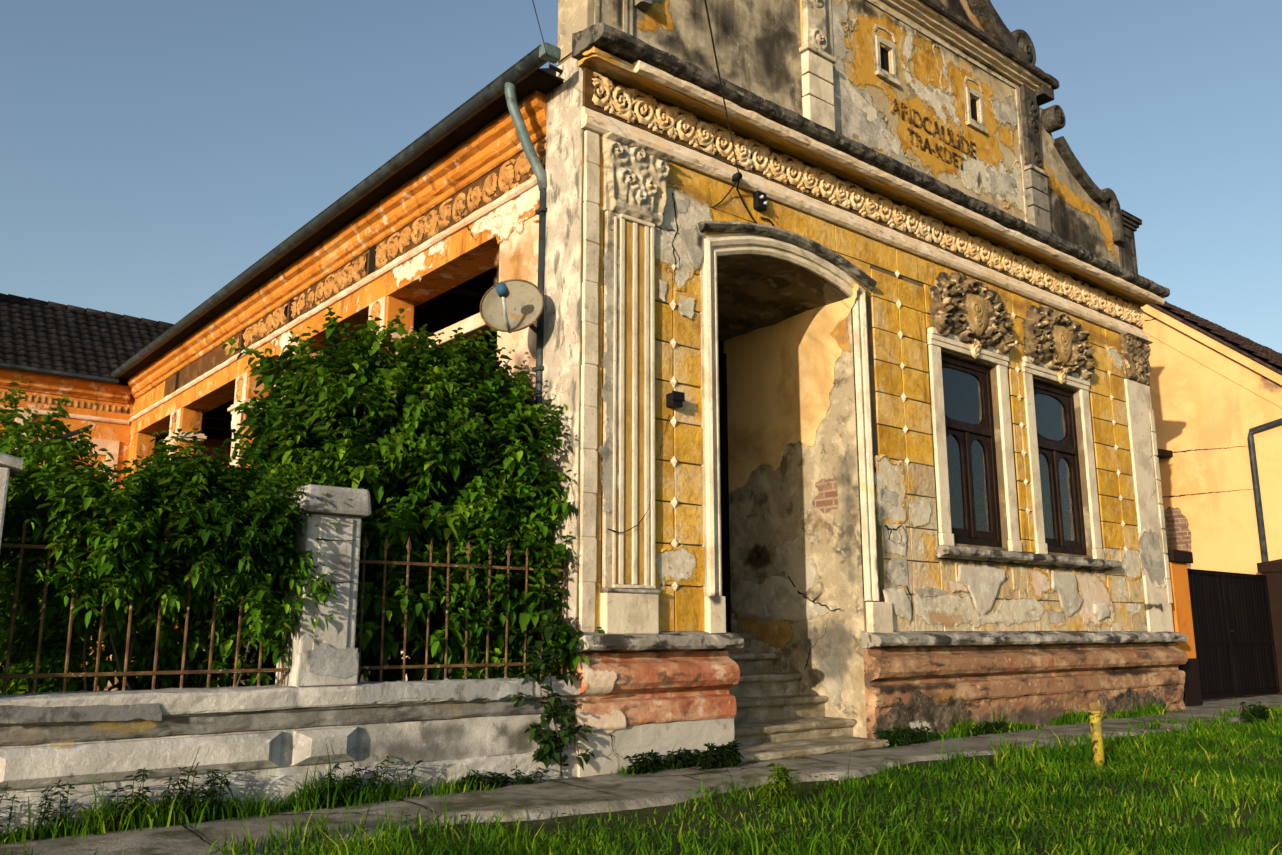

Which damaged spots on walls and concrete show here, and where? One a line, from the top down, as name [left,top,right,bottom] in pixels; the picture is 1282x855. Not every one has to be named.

damp [662,32,705,66]
damp [717,8,733,43]
damp [756,15,792,85]
flaking render [825,0,934,177]
peeling [898,17,962,130]
peeling [471,174,540,244]
flaking render [952,152,1028,216]
damp [1048,180,1100,257]
peeling [390,236,451,289]
peeling [655,544,699,593]
flaking render [874,454,1192,628]
flaking render [574,661,626,739]